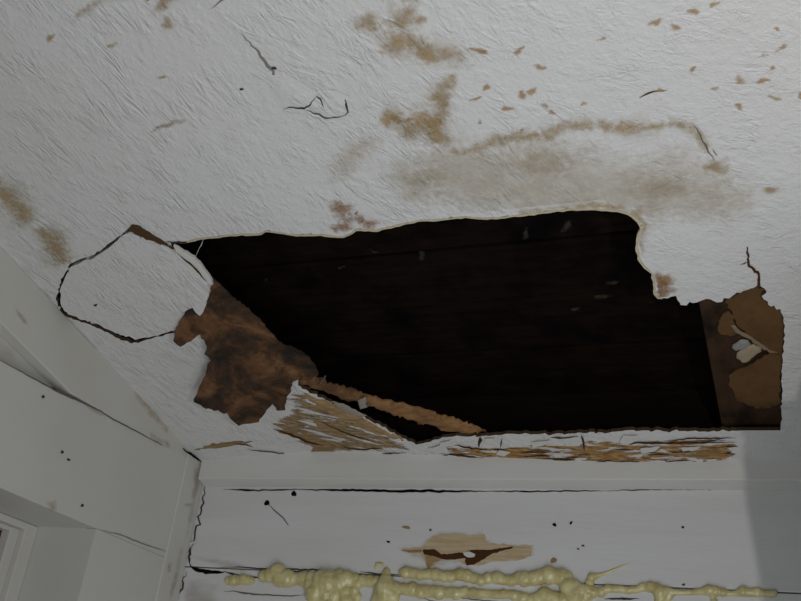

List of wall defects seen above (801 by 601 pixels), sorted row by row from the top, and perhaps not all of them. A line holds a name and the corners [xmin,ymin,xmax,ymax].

crack [285,96,349,119]
spalling [127,224,174,250]
spalling [186,208,662,299]
crack [741,247,761,288]
spalling [717,286,784,409]
peeling [273,393,409,454]
peeling [195,441,284,454]
peeling [428,435,738,462]
crack [179,487,300,597]
crack [607,593,639,601]